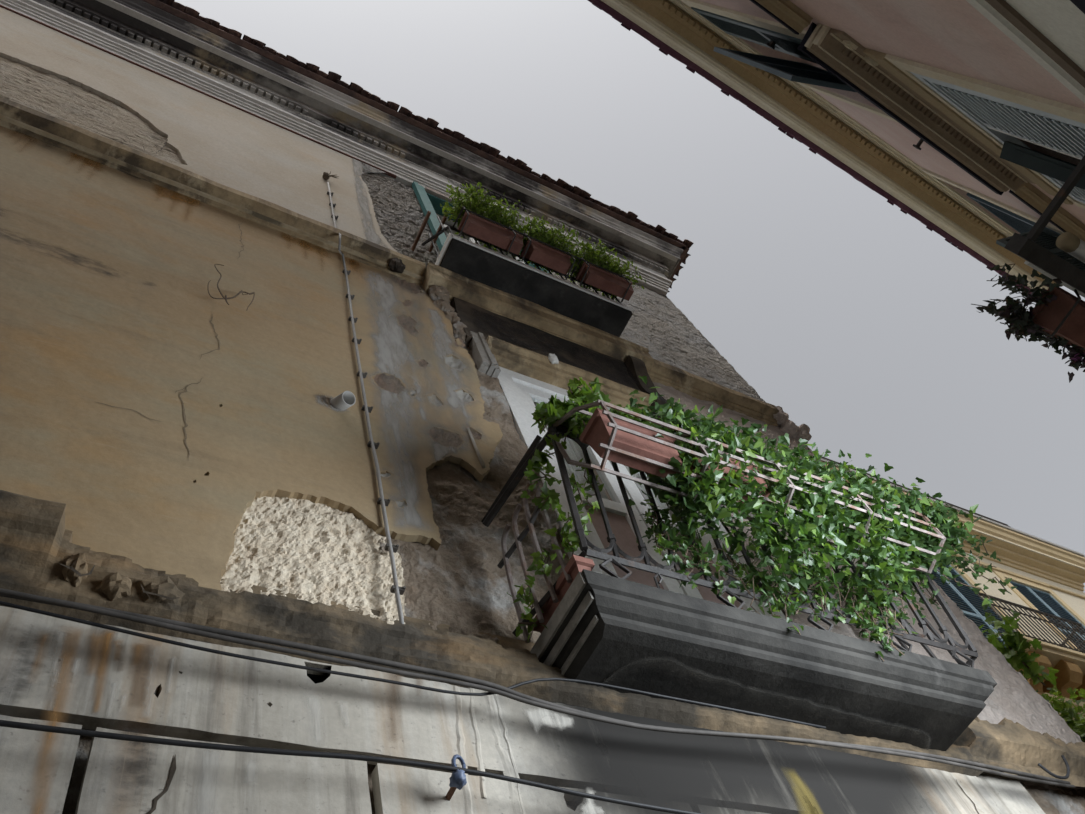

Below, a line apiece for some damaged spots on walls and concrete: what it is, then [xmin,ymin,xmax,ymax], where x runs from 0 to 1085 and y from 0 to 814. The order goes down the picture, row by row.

spalling [0,56,183,164]
crack [97,314,220,458]
spalling [220,338,560,644]
crack [146,754,176,814]